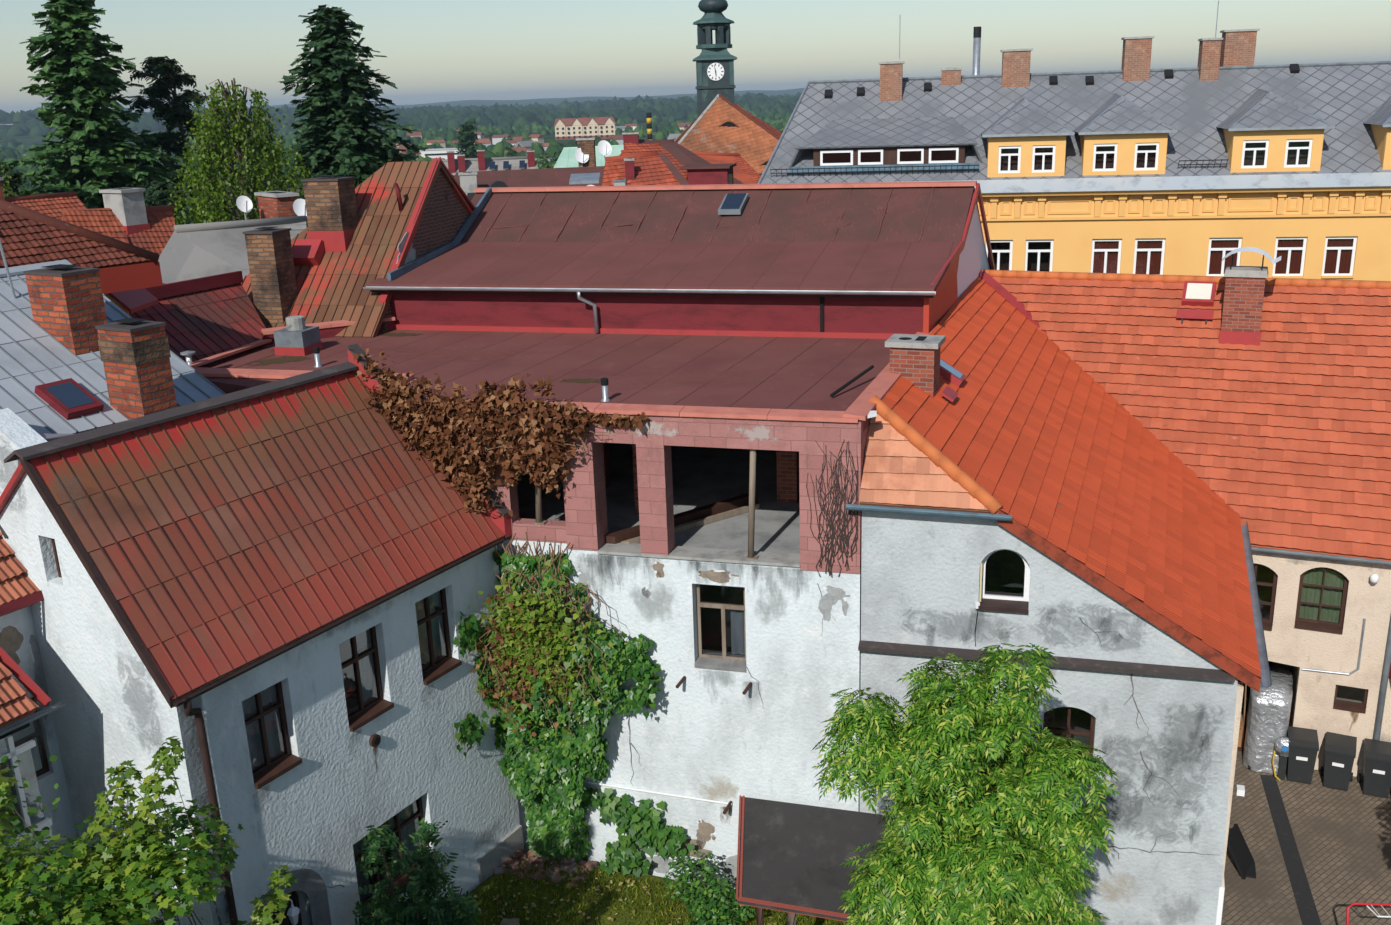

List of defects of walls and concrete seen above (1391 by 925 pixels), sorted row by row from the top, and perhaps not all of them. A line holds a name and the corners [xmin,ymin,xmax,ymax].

peeling [698,570,739,583]
peeling [818,585,850,621]
crack [1124,674,1180,804]
crack [1105,833,1210,860]